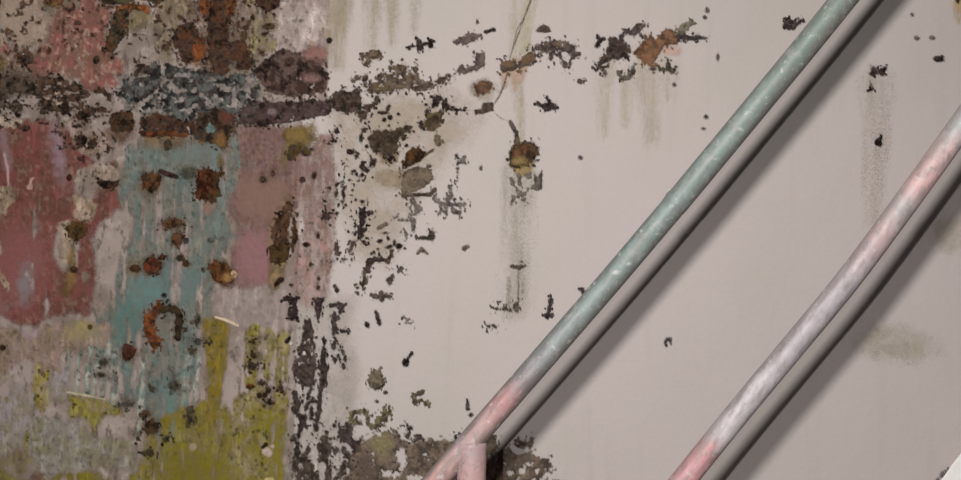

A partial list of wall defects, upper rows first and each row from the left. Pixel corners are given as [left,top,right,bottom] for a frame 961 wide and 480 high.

corrosion [88,0,164,72]
corrosion [168,0,284,88]
corrosion [466,54,529,143]
crack [495,0,531,136]
peeling [649,57,678,86]
corrosion [631,17,707,73]
corrosion [70,105,239,216]
peeling [0,0,649,480]
corrosion [85,293,213,381]
corrosion [148,375,199,429]